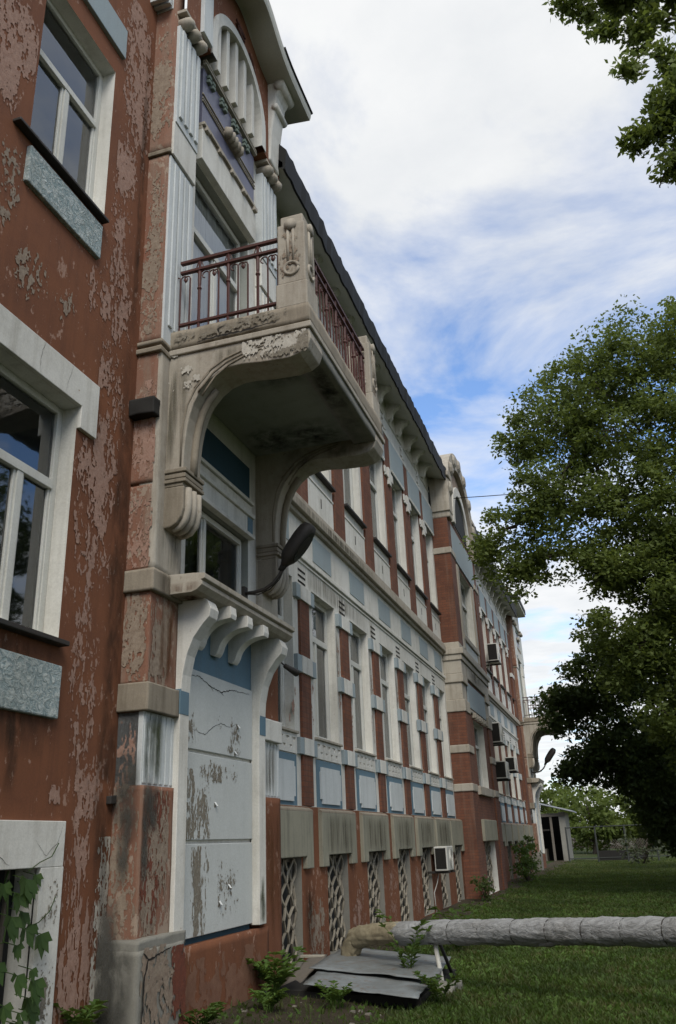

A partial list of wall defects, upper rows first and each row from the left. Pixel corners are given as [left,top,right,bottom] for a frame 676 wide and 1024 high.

flaking render [0,0,40,114]
flaking render [0,134,24,227]
flaking render [142,308,287,397]
flaking render [242,328,308,359]
flaking render [14,0,174,1024]